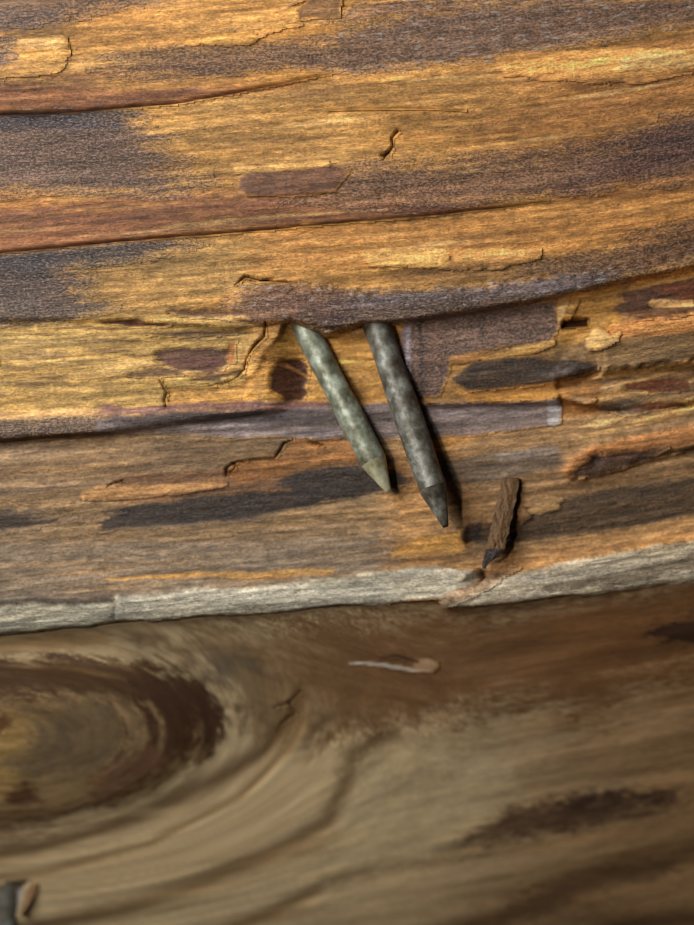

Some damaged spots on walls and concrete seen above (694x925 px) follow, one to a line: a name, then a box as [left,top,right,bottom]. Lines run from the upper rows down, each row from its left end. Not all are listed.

crack [326,107,467,161]
crack [209,320,268,387]
crack [224,437,325,478]